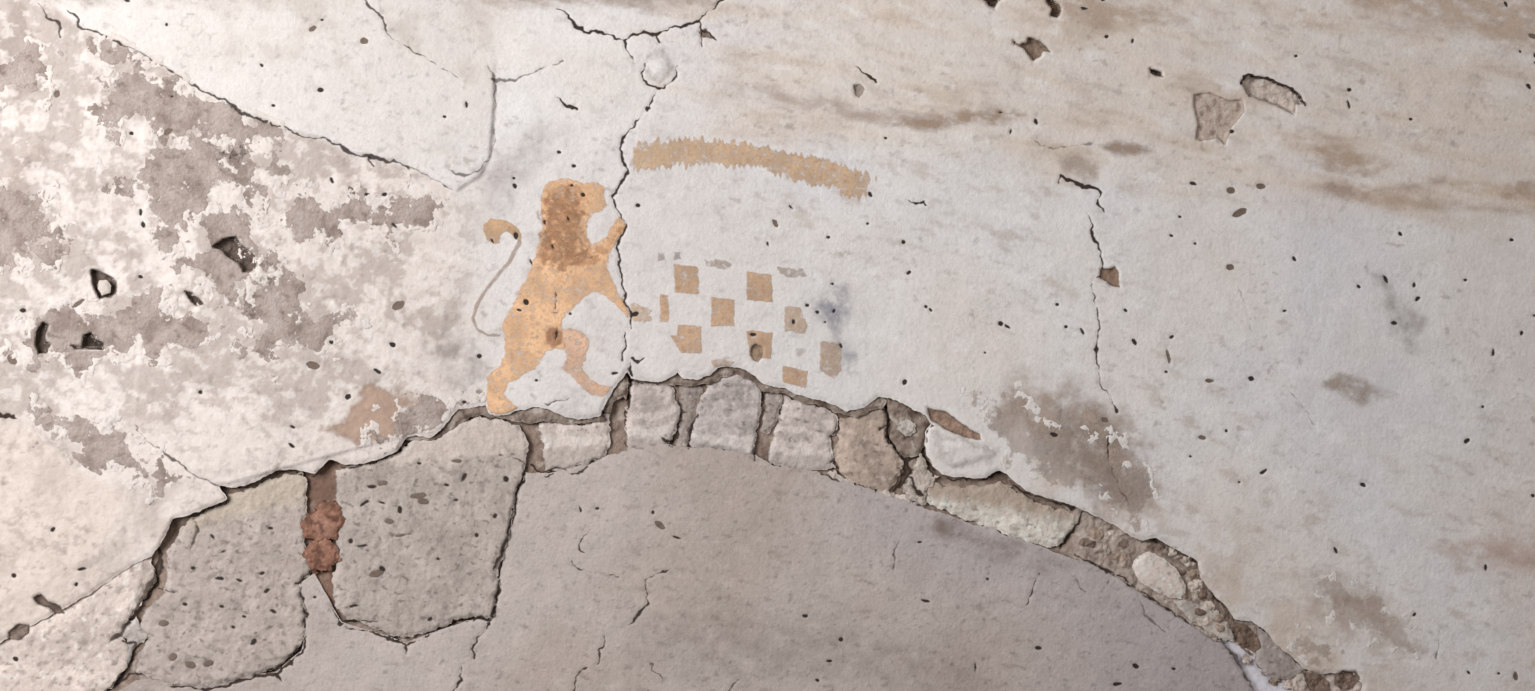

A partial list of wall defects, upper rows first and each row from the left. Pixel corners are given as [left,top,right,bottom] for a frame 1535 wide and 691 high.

crack [38,3,451,189]
spalling [1194,73,1306,144]
crack [105,0,723,691]
crack [1058,174,1118,457]
spalling [658,333,1007,467]
peeling [1014,380,1061,437]
leakage [1003,394,1140,494]
peeling [1080,417,1163,500]
spalling [360,481,428,537]
spalling [8,624,29,661]
spalling [169,653,213,668]
peeling [1286,571,1420,666]